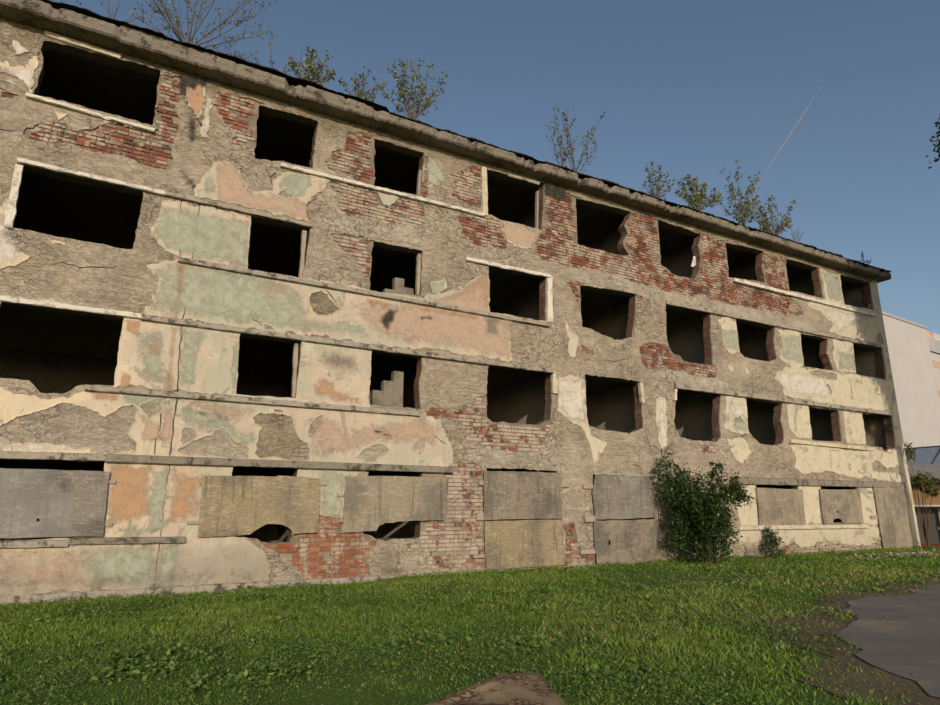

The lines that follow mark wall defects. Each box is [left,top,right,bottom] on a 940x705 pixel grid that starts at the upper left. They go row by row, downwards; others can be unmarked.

spalling [23,75,263,170]
spalling [176,133,921,555]
peeling [0,397,165,454]
spalling [249,515,376,578]
spalling [406,460,486,572]
spalling [563,522,596,566]